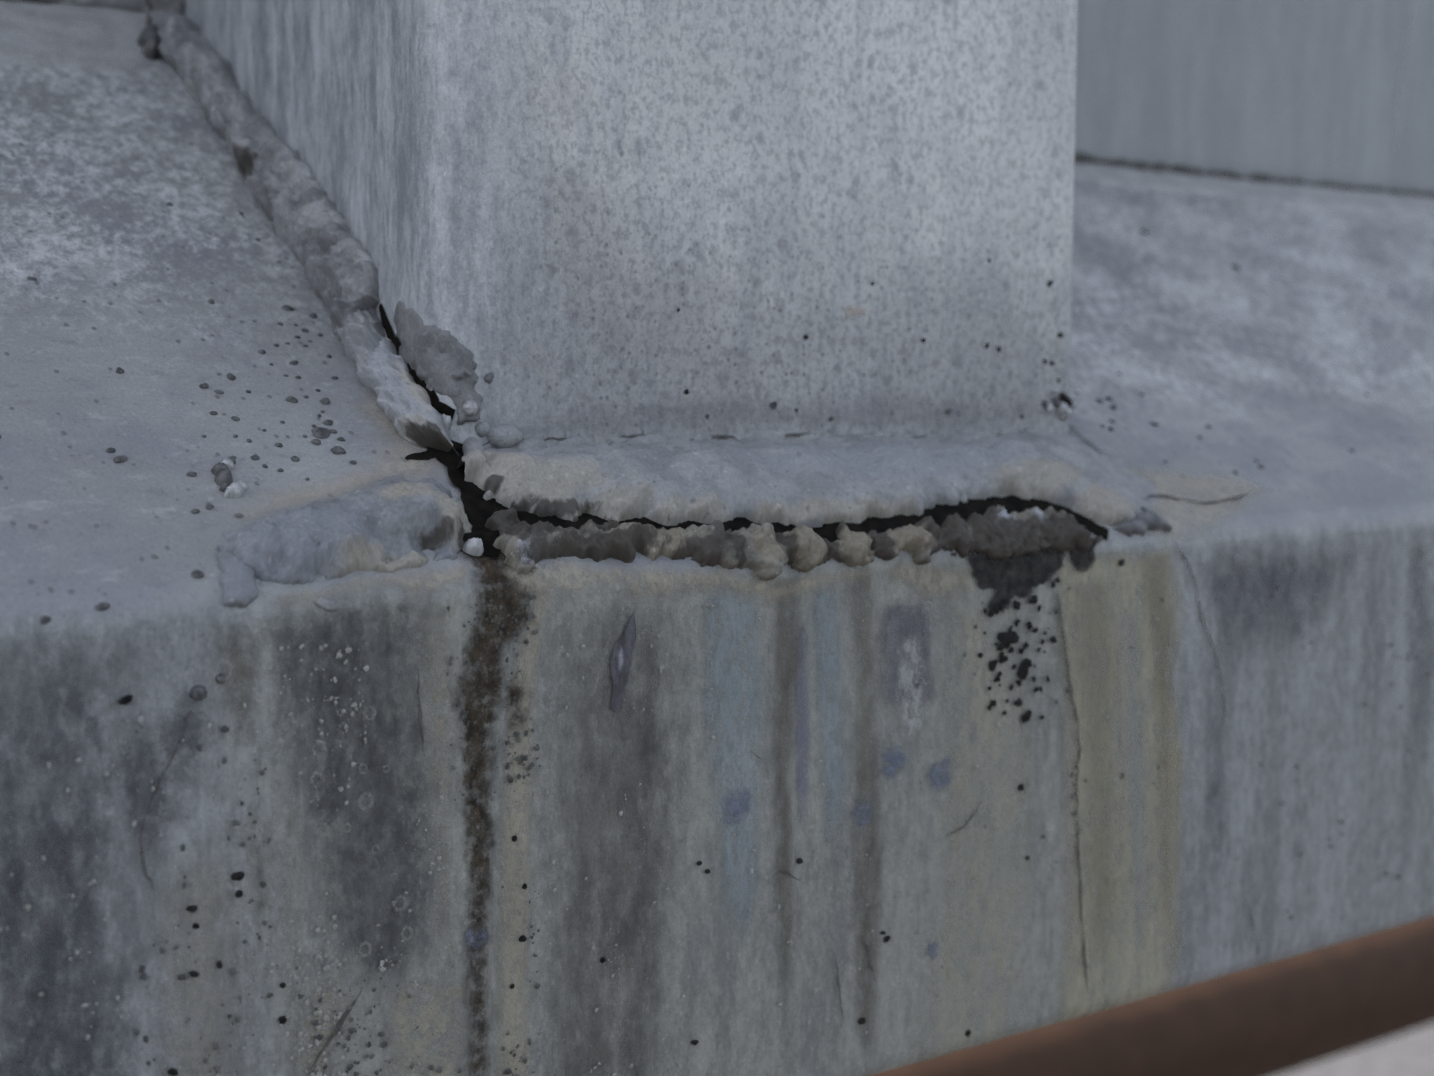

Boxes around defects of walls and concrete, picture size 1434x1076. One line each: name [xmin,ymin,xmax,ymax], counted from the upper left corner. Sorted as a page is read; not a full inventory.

leakage [0,684,93,1076]
leakage [169,875,222,1076]
leakage [282,613,418,962]
rust [458,550,547,1076]
leakage [574,639,657,1076]
leakage [513,563,841,917]
crack [379,304,1109,558]
leakage [884,607,930,698]
leakage [919,617,1019,1062]
peeling [968,544,1096,723]
crack [1057,594,1089,994]
peeling [1113,506,1172,537]